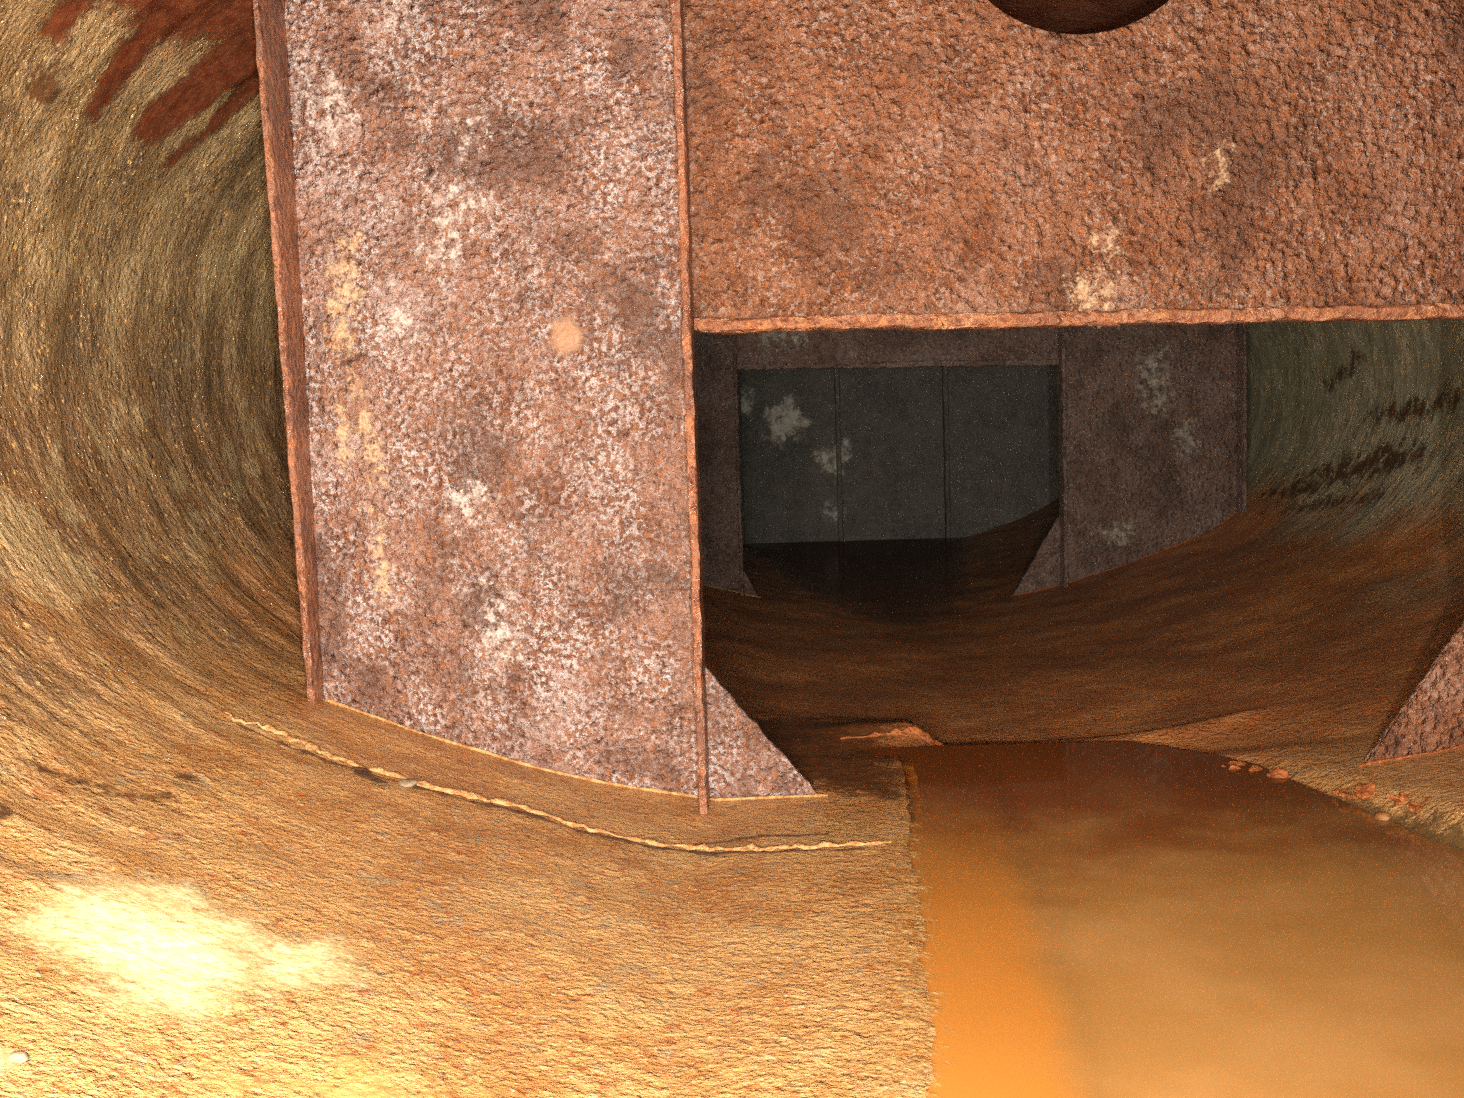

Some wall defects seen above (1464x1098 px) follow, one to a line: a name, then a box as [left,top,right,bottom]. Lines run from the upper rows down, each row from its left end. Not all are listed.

corrosion [26,0,259,169]
corrosion [1202,140,1235,192]
corrosion [1063,229,1127,311]